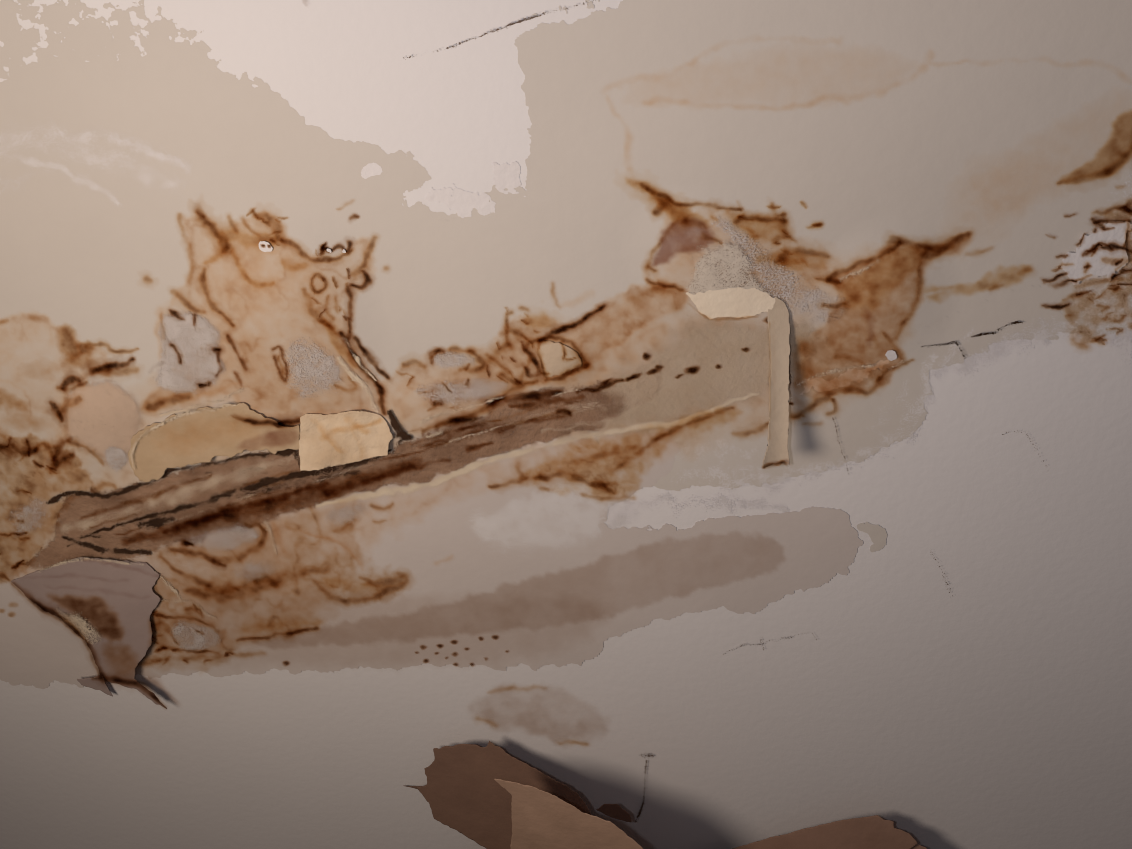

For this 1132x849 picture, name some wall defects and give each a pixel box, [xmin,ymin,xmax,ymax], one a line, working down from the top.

crack [437,0,594,51]
water stain [712,208,941,327]
water stain [259,239,389,415]
water stain [61,351,134,391]
water stain [146,305,245,417]
water stain [625,353,662,381]
water stain [235,417,300,428]
peeling [562,413,646,444]
peeling [611,426,664,437]
water stain [0,440,74,470]
peeling [857,522,888,552]
peeling [11,557,167,709]